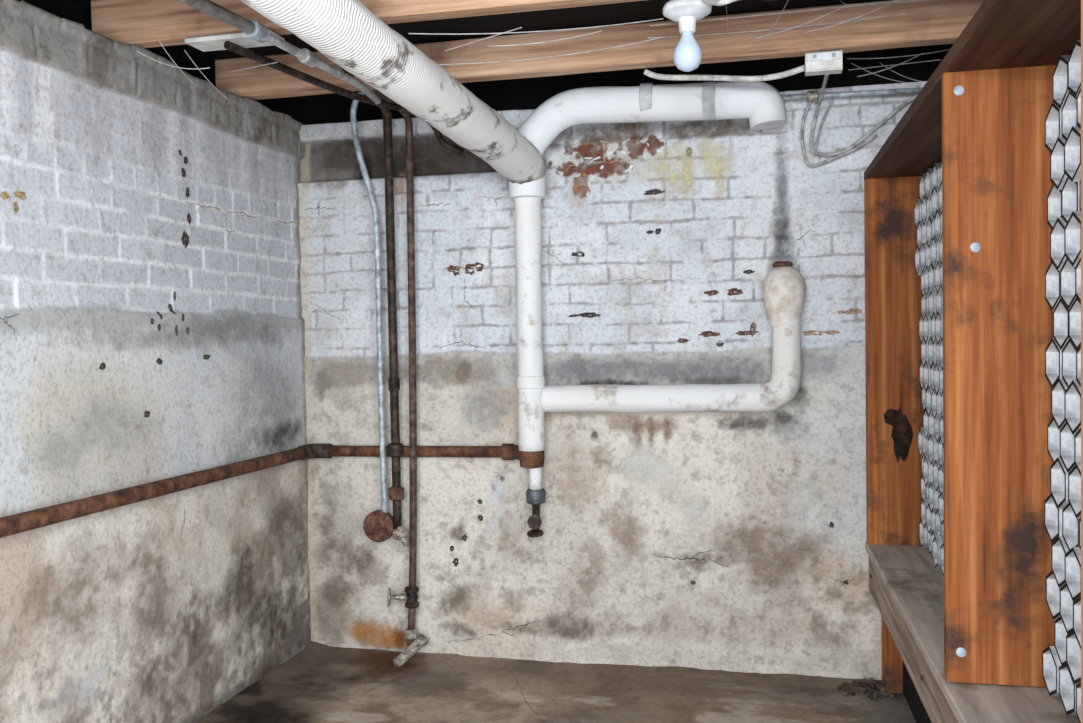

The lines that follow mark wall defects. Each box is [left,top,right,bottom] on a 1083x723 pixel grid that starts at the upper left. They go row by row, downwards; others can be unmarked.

peeling [548,135,664,198]
leakage [387,358,487,384]
leakage [565,361,753,385]
leakage [615,419,670,480]
leakage [733,530,805,584]
leakage [230,552,285,637]
rust [356,626,417,676]
leakage [548,619,592,638]